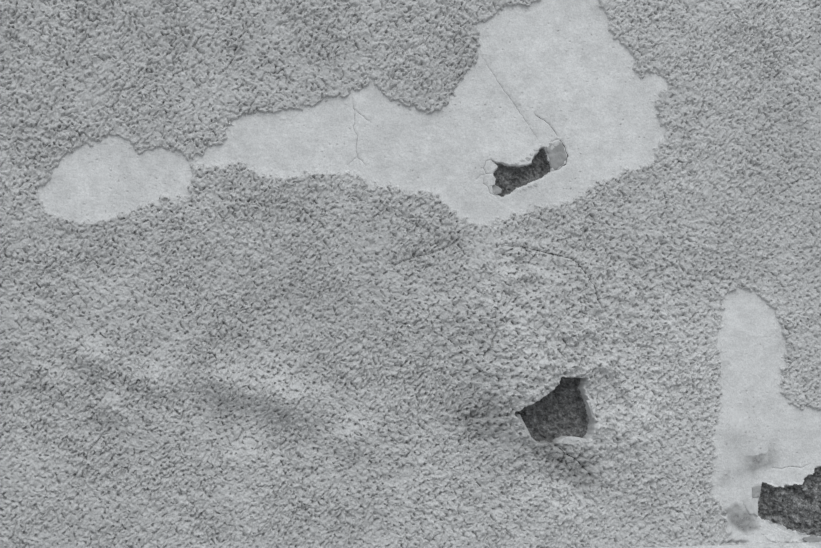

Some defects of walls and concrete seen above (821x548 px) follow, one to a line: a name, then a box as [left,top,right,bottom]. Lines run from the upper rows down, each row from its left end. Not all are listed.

peeling [38,0,668,227]
spalling [515,377,596,445]
peeling [710,285,821,545]